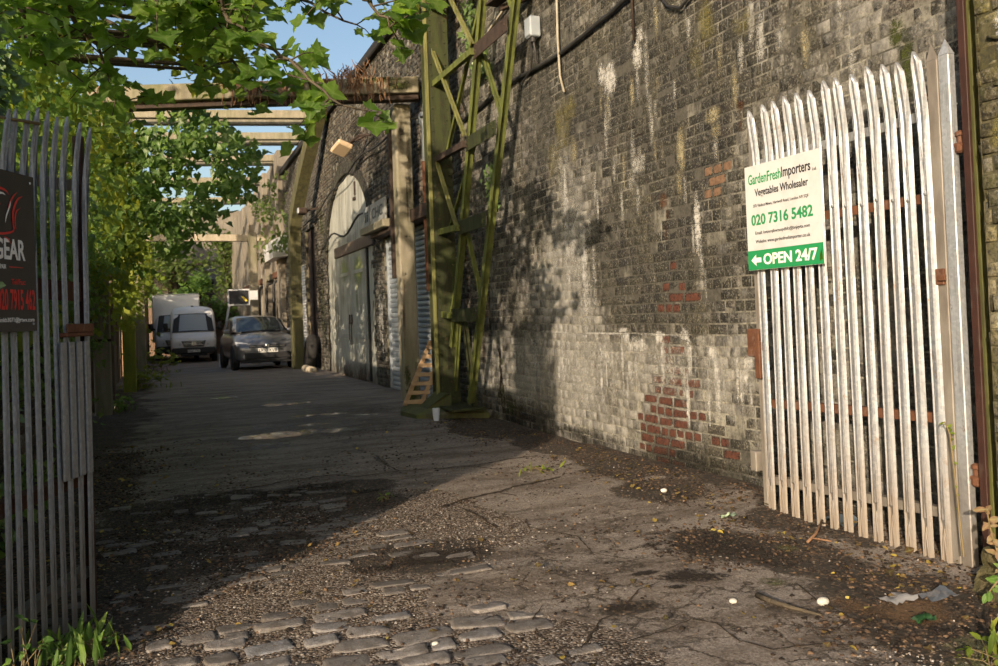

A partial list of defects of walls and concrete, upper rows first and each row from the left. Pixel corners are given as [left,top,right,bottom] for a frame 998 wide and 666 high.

damp [598,60,617,148]
damp [630,29,656,151]
damp [613,141,644,210]
spalling [498,328,740,467]
crack [174,455,640,561]